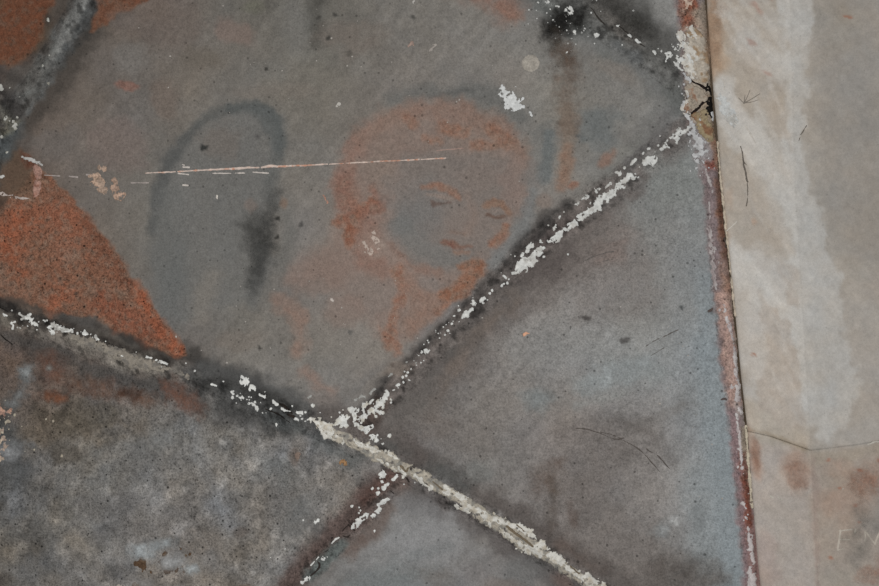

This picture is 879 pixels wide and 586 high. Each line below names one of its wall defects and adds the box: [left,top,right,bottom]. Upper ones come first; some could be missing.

leakage [543,7,584,62]
crack [591,8,645,47]
flaking render [88,165,126,201]
crack [689,0,748,432]
flaking render [0,400,16,462]